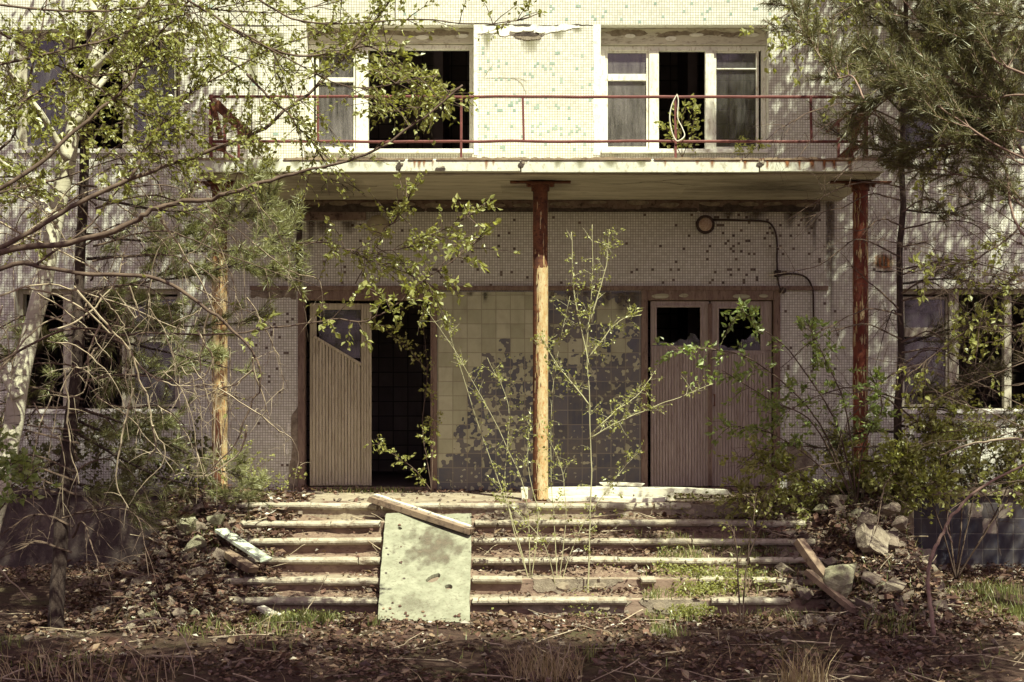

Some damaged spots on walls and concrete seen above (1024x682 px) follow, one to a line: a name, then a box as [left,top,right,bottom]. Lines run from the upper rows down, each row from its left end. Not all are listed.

spalling [510,28,545,40]
rust [728,158,856,169]
peeling [290,200,821,538]
spalling [74,590,172,670]
spalling [851,519,1003,682]